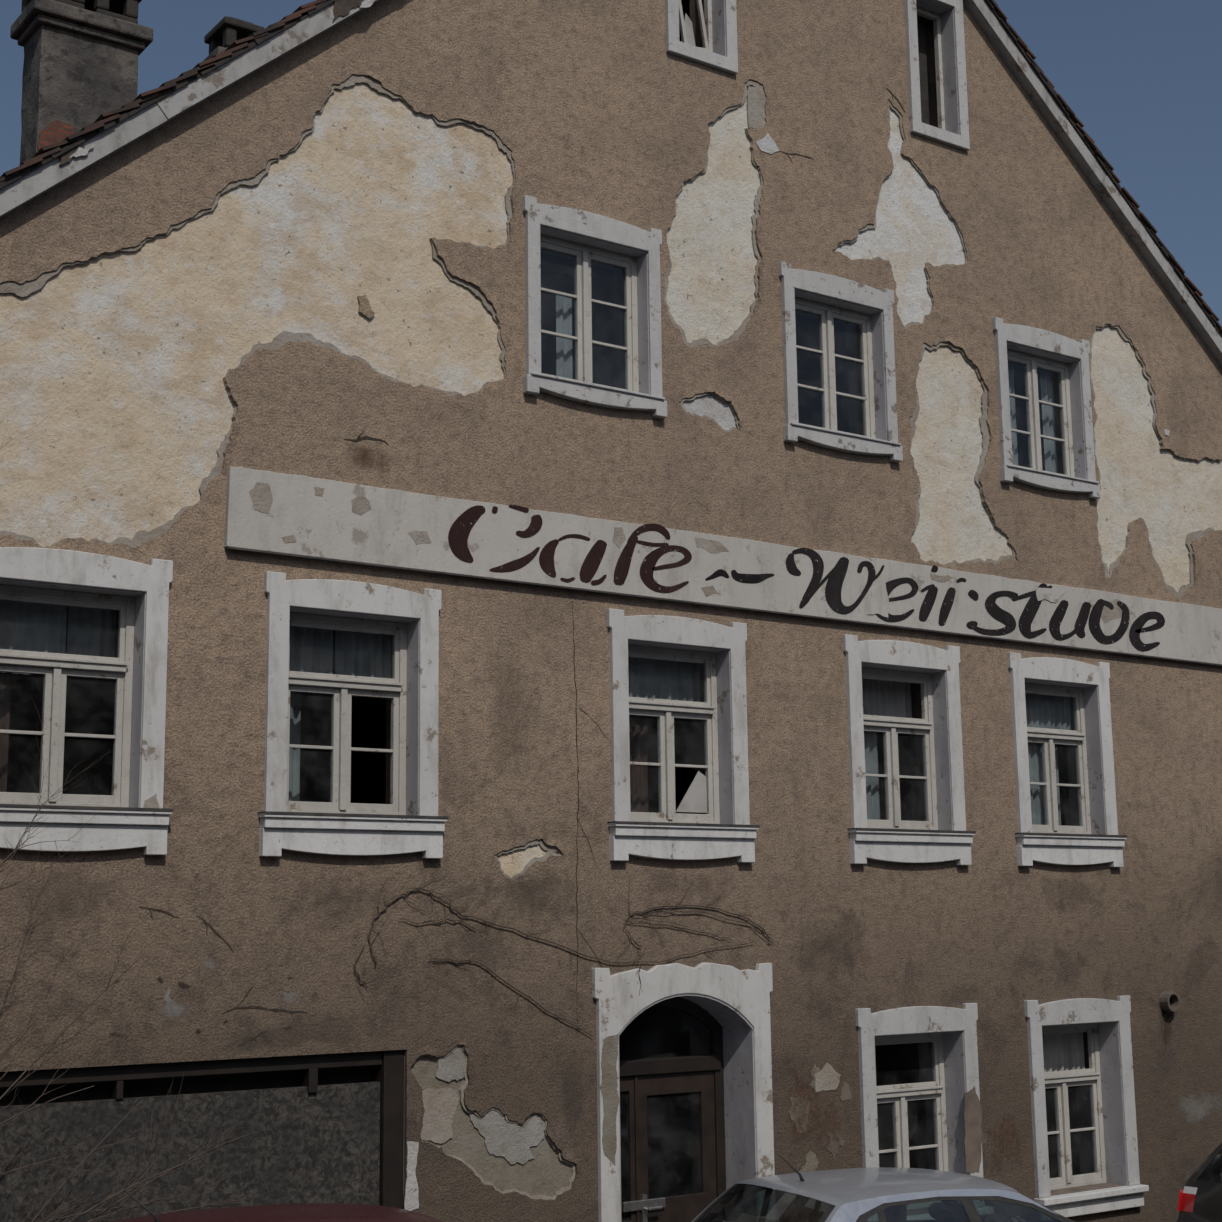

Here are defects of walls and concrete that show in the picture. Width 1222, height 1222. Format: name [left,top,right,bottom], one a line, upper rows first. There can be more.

peeling [332,0,375,22]
peeling [0,70,518,547]
peeling [679,386,744,433]
peeling [664,80,779,347]
peeling [833,100,967,328]
peeling [909,336,1021,582]
peeling [1089,324,1222,598]
peeling [494,831,568,881]
crack [572,608,608,1026]
peeling [404,1039,582,1211]